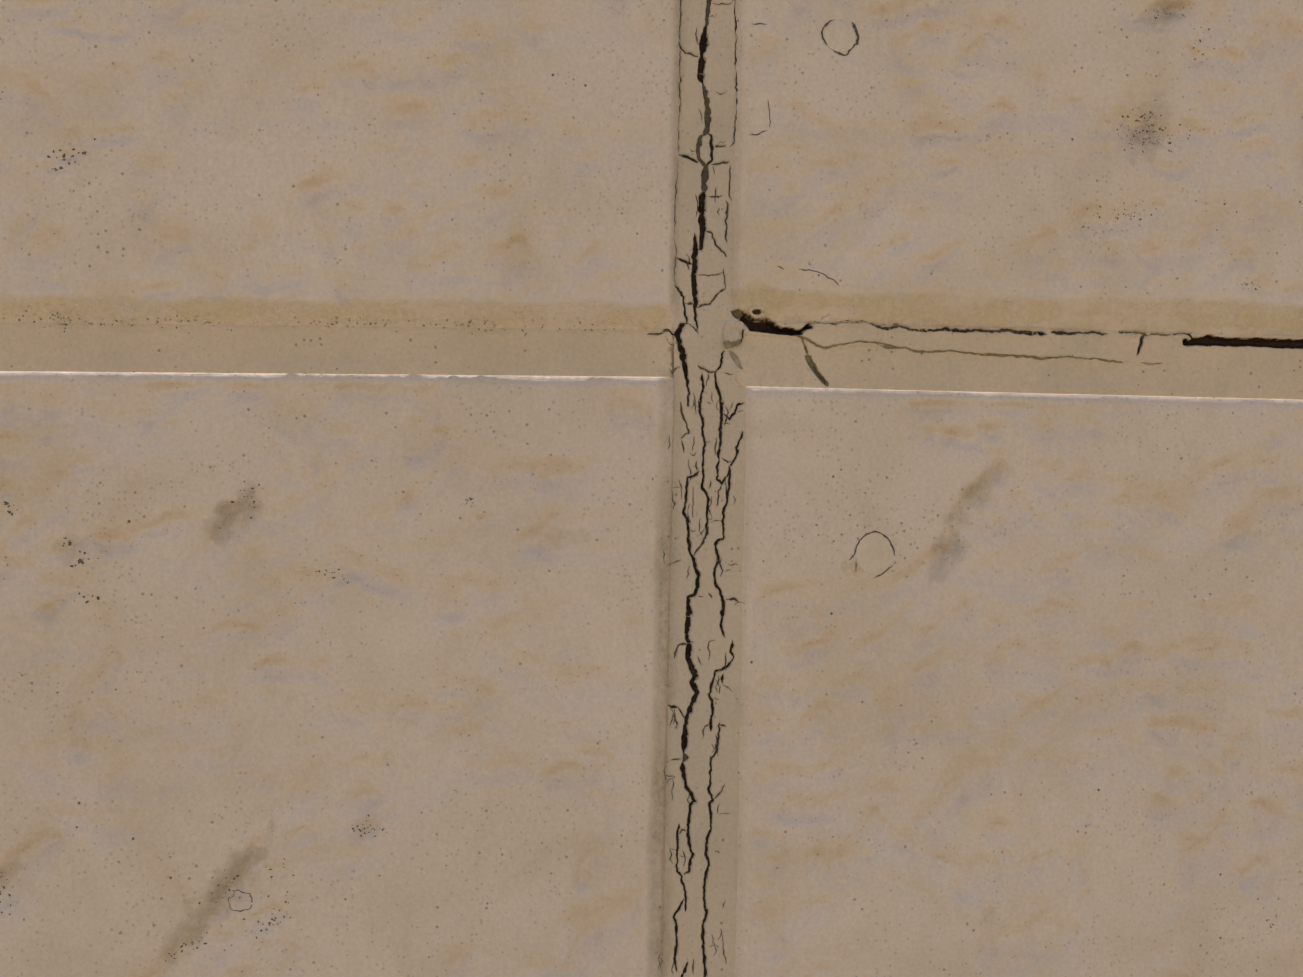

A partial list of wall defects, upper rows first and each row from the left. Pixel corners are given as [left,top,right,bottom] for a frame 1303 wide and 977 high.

crack [640,0,771,977]
crack [778,266,1192,365]